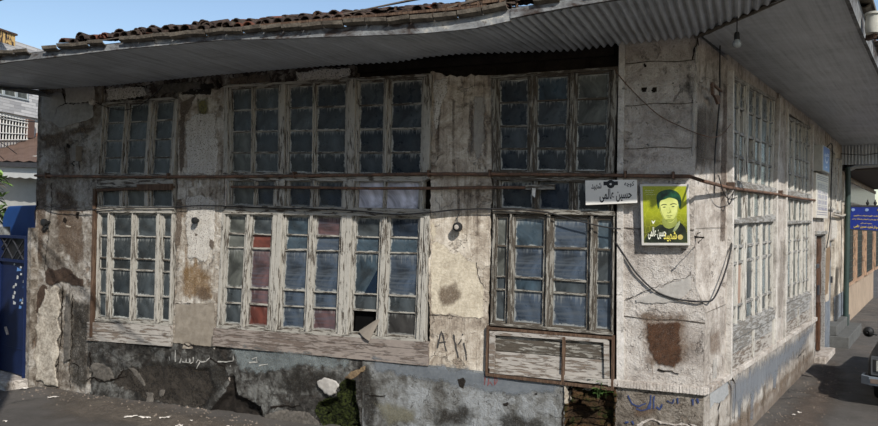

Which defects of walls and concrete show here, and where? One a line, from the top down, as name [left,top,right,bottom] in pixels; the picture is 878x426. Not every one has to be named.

flaking render [296,67,351,81]
water stain [183,230,211,300]
flaking render [33,267,83,387]
flaking render [90,362,263,417]
flaking render [315,366,365,426]
water stain [436,407,469,424]
water stain [501,415,541,426]
flaking render [564,382,617,426]